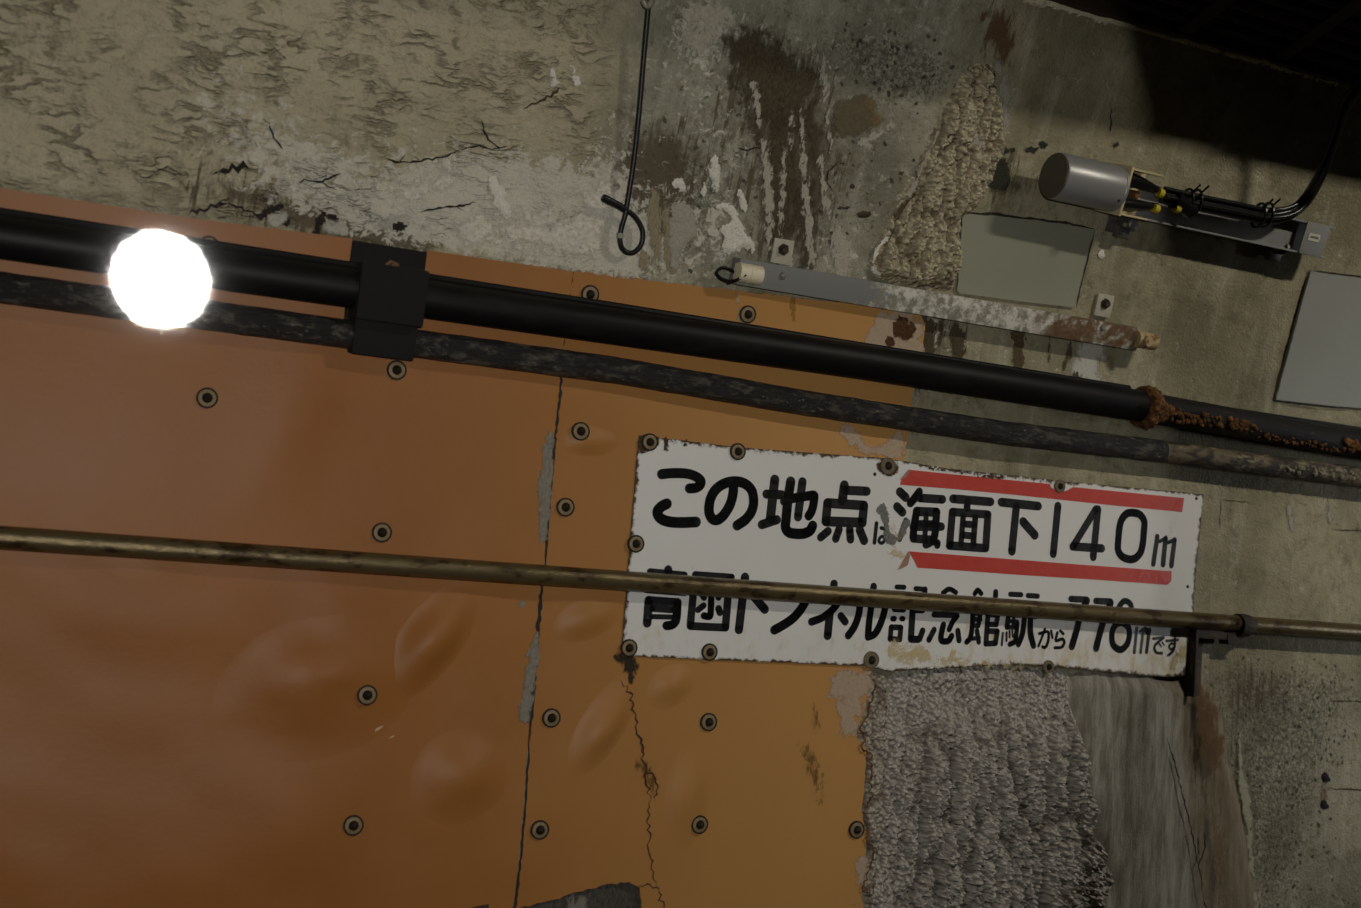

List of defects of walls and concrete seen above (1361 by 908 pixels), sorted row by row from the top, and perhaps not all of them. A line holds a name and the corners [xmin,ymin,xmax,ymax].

crack [525,88,559,108]
crack [189,160,267,218]
crack [299,173,340,190]
crack [386,122,507,163]
crack [422,202,476,212]
water stain [637,0,885,276]
water stain [870,60,1013,290]
rust [1142,385,1361,457]
peeling [537,431,555,543]
peeling [518,632,540,723]
peeling [827,665,874,737]
crack [621,681,665,908]